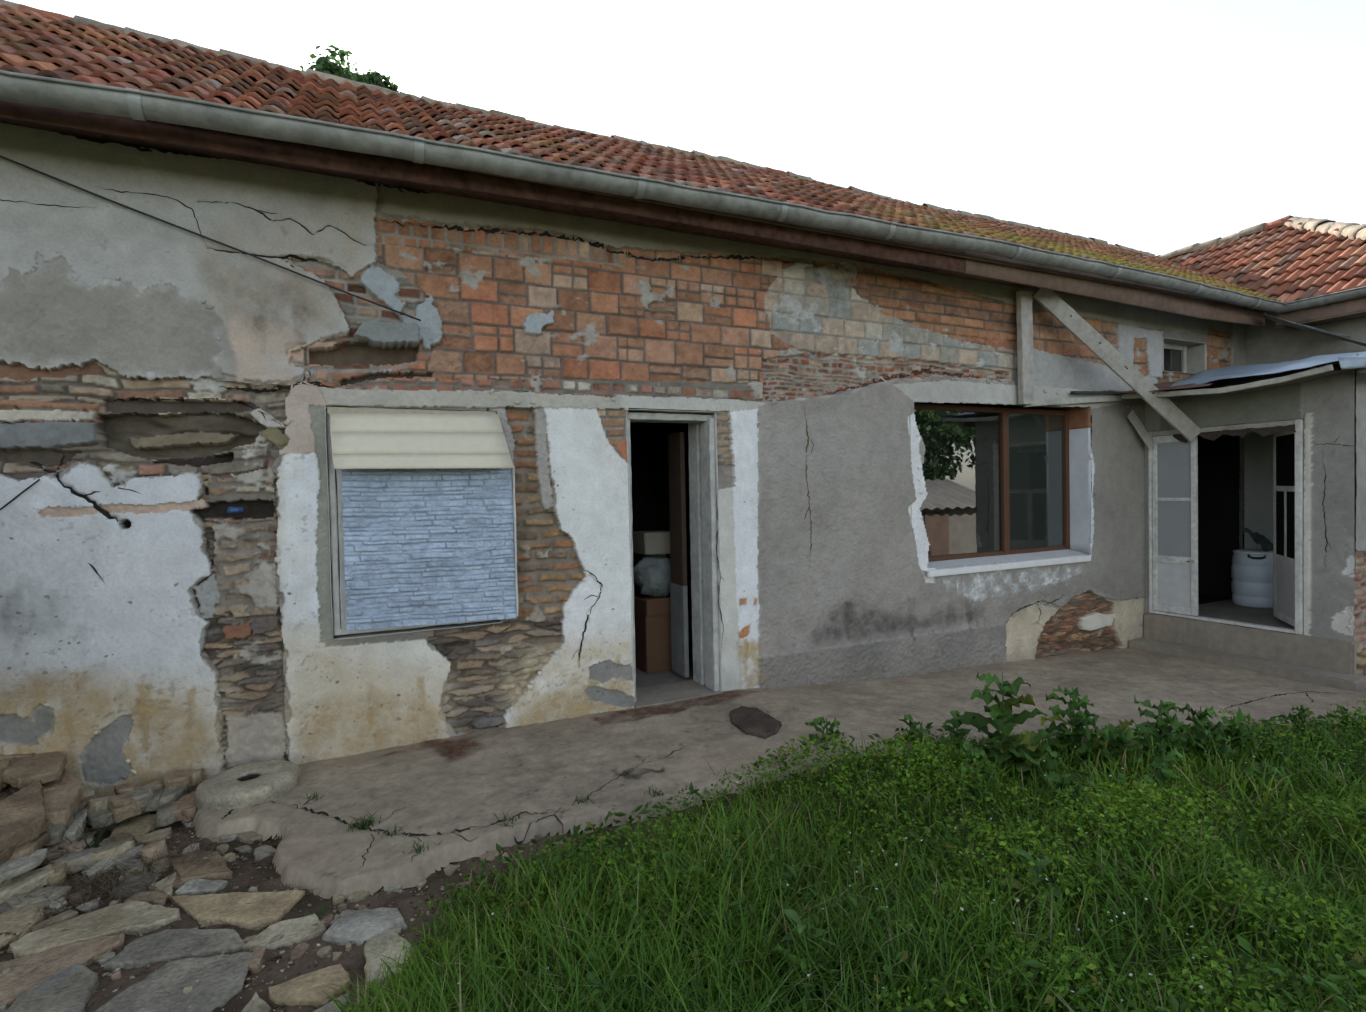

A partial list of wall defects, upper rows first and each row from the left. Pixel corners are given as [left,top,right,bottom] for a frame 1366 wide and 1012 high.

crack [0,180,790,268]
spalling [1082,316,1234,384]
crack [29,453,141,522]
spalling [0,251,305,769]
spalling [287,216,1133,734]
crack [804,366,1002,567]
crack [571,569,603,664]
spalling [1333,550,1366,676]
damp [17,713,100,770]
peeling [79,708,137,787]
crack [221,747,683,871]